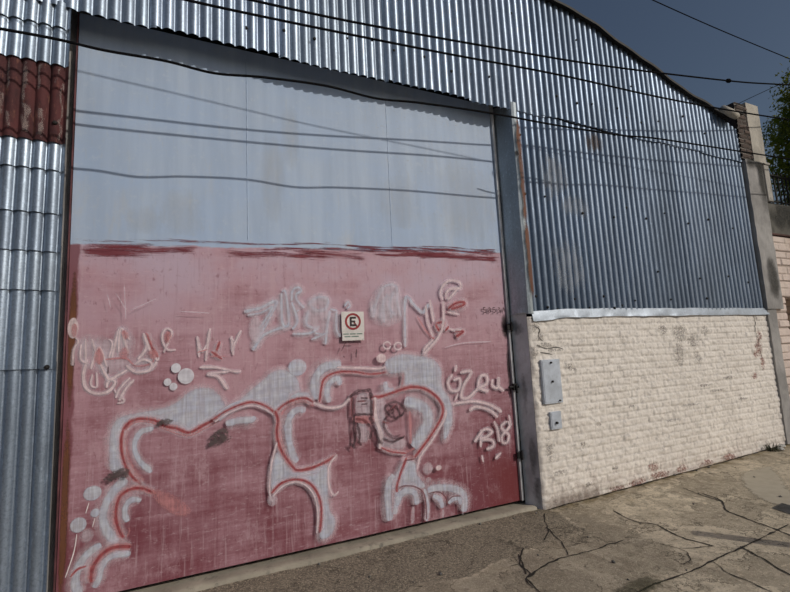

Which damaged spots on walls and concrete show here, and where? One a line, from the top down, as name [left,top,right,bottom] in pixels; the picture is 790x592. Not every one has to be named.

damp [748,159,767,199]
corrosion [516,120,534,294]
damp [769,261,779,294]
peeling [661,325,708,365]
crack [684,488,790,535]
crack [512,513,623,592]
crack [613,510,772,592]
crack [740,546,790,575]